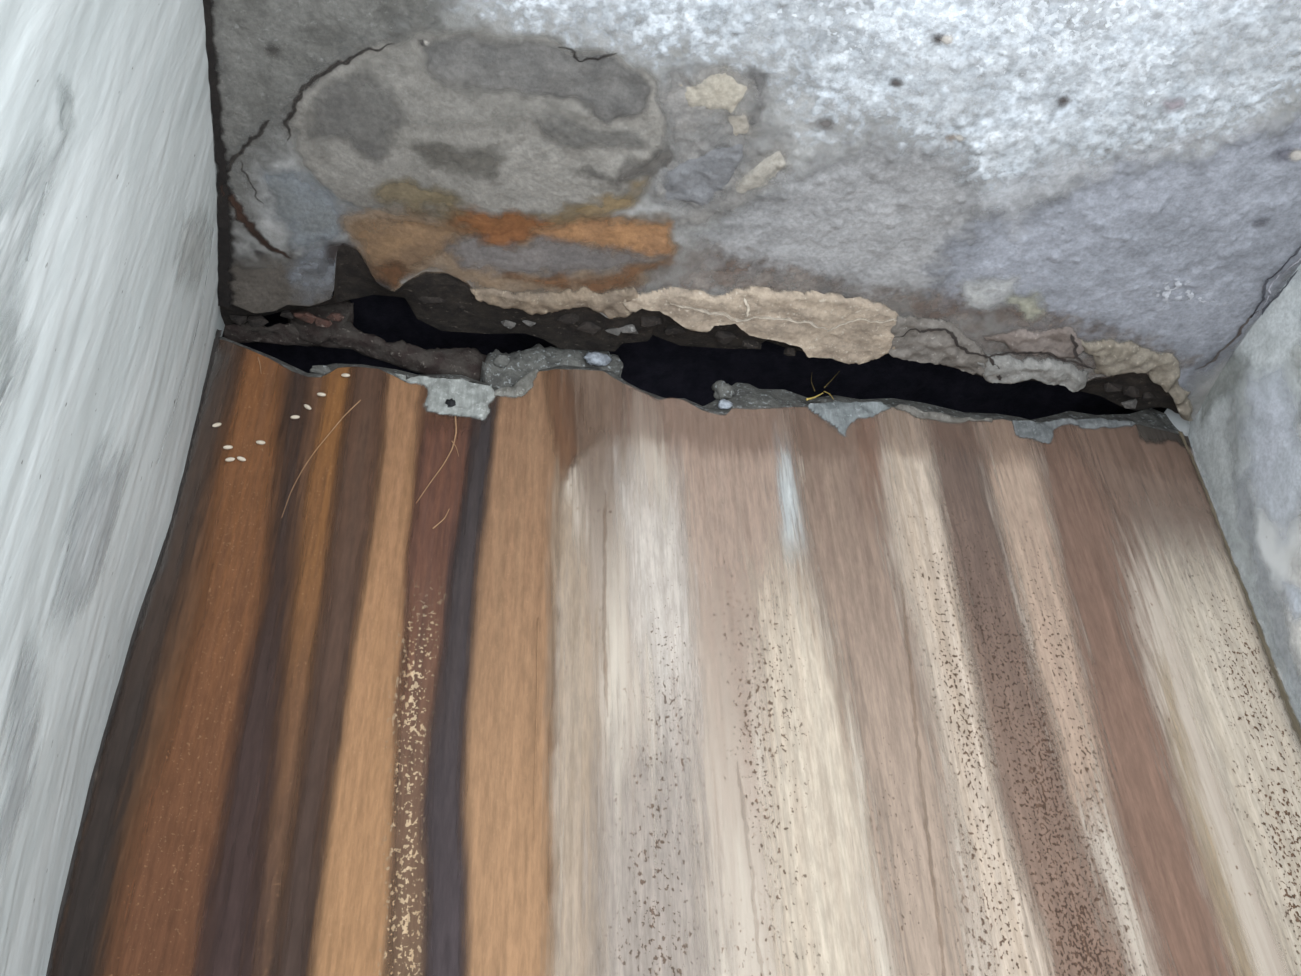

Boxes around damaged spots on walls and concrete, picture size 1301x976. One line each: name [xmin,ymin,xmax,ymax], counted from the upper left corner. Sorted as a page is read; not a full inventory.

water stain [211,0,442,313]
corrosion [341,180,1117,378]
flaking render [395,369,539,420]
flaking render [470,286,1193,421]
flaking render [808,401,993,436]
flaking render [1012,418,1136,444]